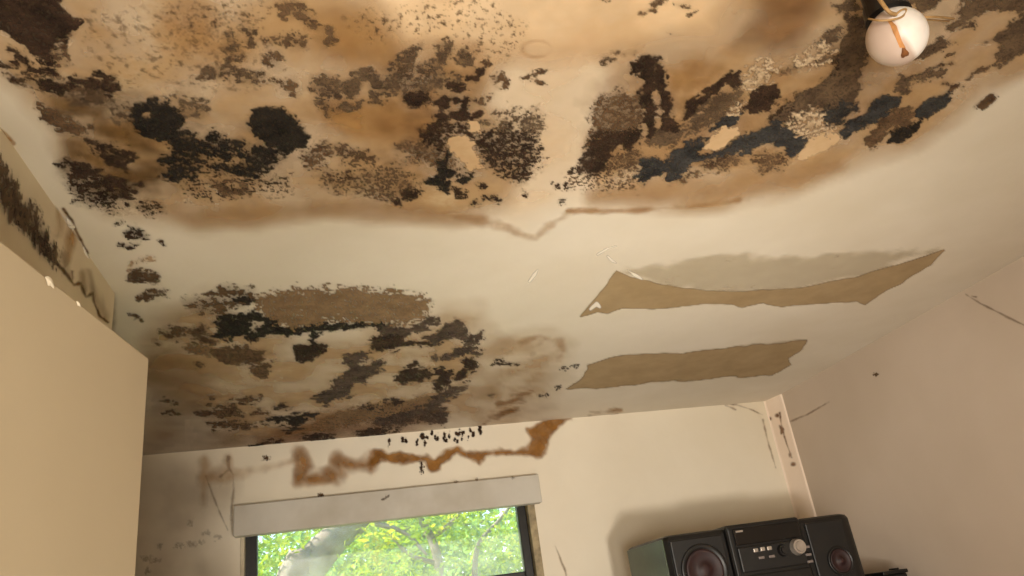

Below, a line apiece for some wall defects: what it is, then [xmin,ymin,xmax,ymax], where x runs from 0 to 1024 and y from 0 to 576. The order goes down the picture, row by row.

damp [0,155,74,271]
damp [127,267,166,322]
damp [150,283,561,461]
damp [0,0,1024,250]